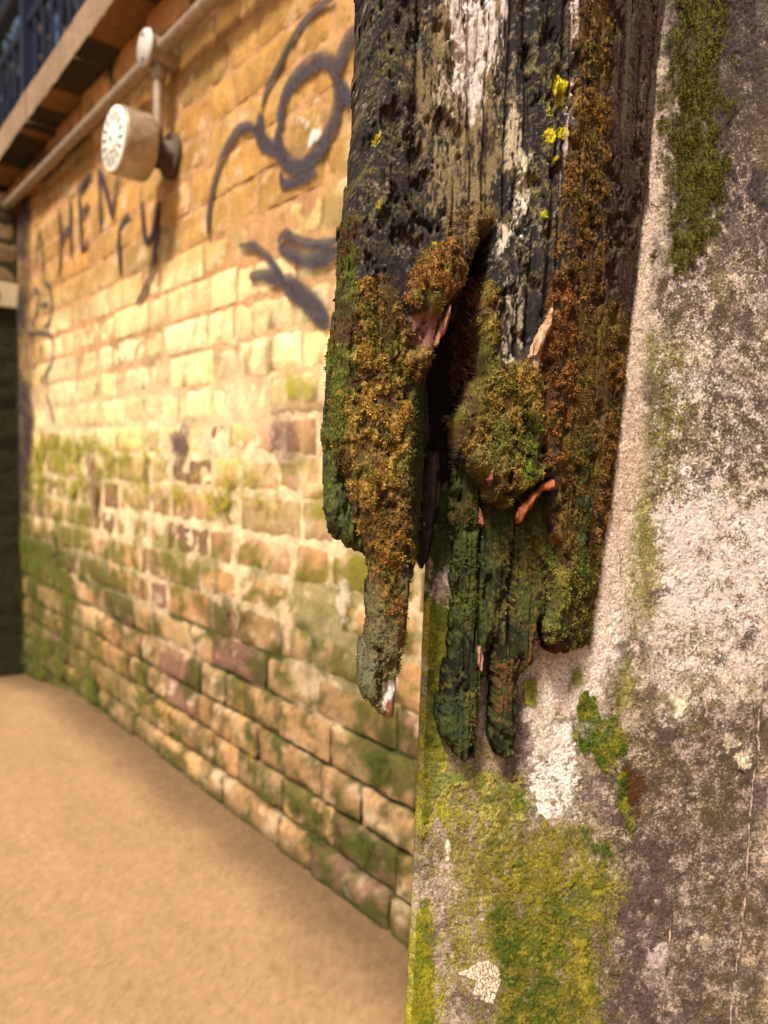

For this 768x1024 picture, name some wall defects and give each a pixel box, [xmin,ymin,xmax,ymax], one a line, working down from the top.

damp [16,199,281,751]
damp [244,781,397,887]
damp [335,579,351,622]
damp [327,596,679,1024]